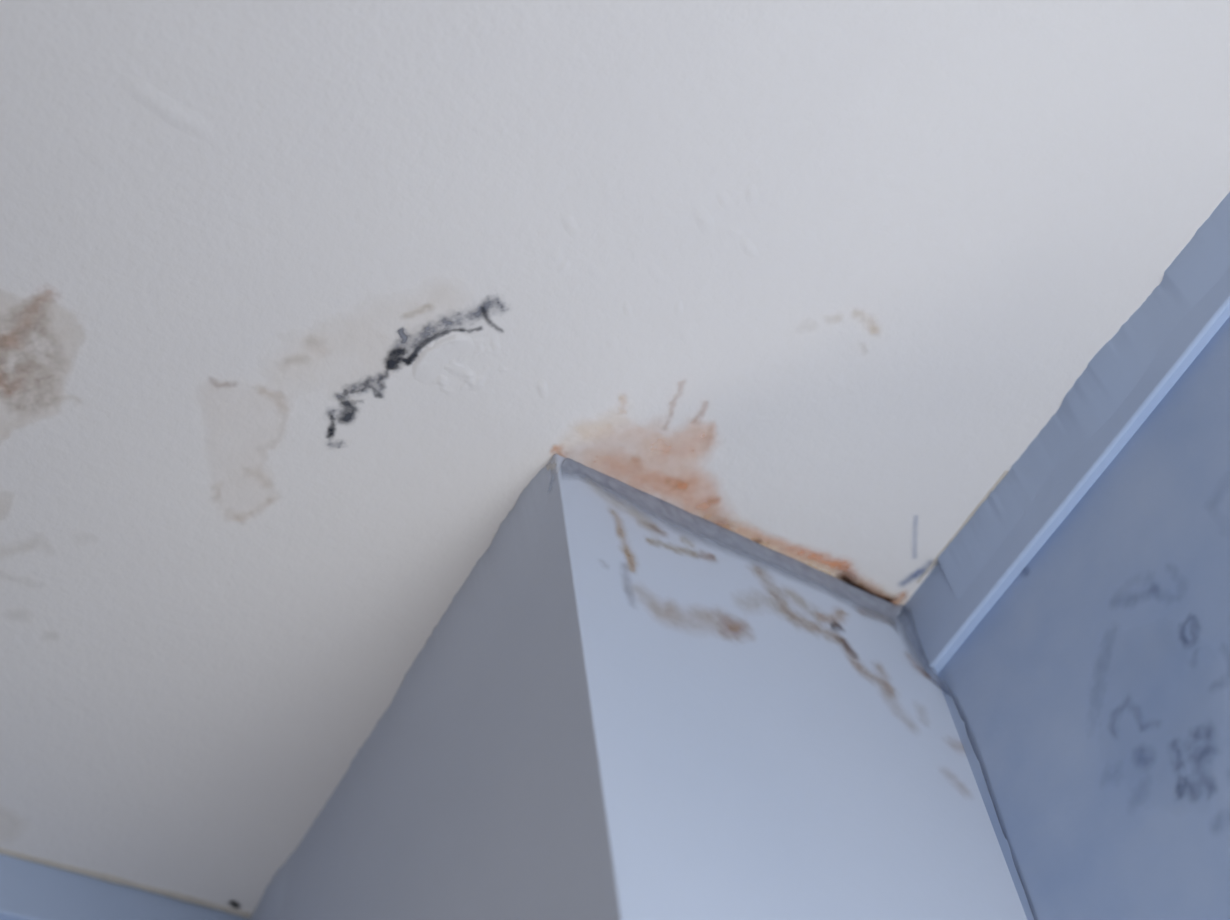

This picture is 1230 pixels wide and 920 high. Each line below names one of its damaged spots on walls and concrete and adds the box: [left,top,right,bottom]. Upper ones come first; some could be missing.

crack [328,299,503,438]